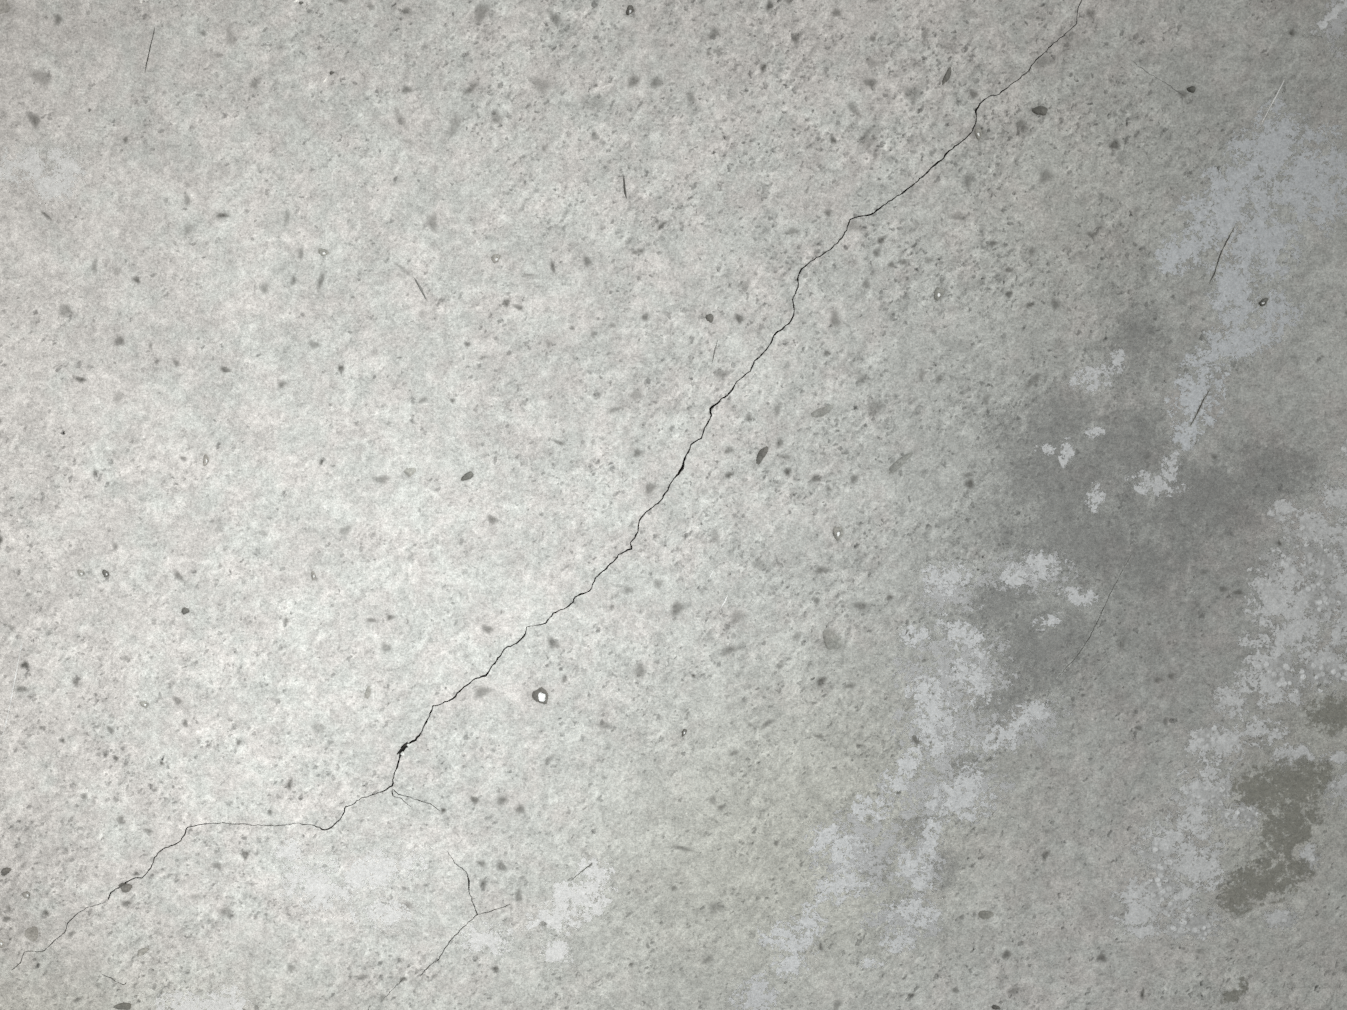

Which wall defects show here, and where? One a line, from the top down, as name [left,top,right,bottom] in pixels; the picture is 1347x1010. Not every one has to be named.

water stain [1310,0,1347,64]
crack [1209,228,1234,284]
water stain [1124,96,1347,497]
water stain [1068,348,1126,393]
crack [12,0,1082,970]
water stain [1034,426,1106,469]
water stain [1084,481,1106,513]
crack [1060,554,1132,675]
water stain [1109,476,1347,941]
water stain [728,549,1099,1010]
crack [368,853,510,1010]
water stain [1221,977,1248,1003]